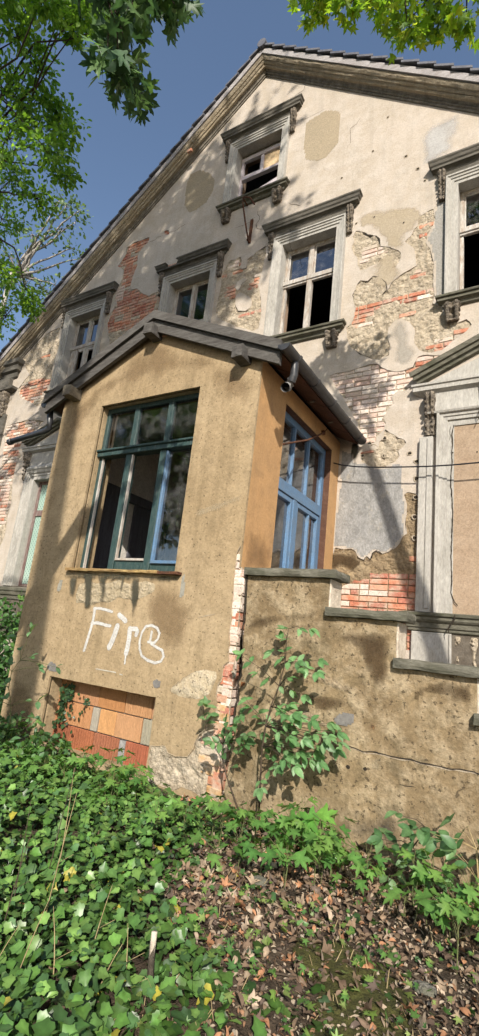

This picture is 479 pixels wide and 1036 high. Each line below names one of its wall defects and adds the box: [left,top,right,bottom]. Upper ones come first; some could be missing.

flaking render [108,237,160,344]
flaking render [216,247,266,331]
flaking render [19,328,60,406]
flaking render [0,420,44,546]
flaking render [330,209,471,650]
crack [448,412,479,633]
water stain [70,573,138,608]
flaking render [147,545,247,803]
crack [332,742,479,787]